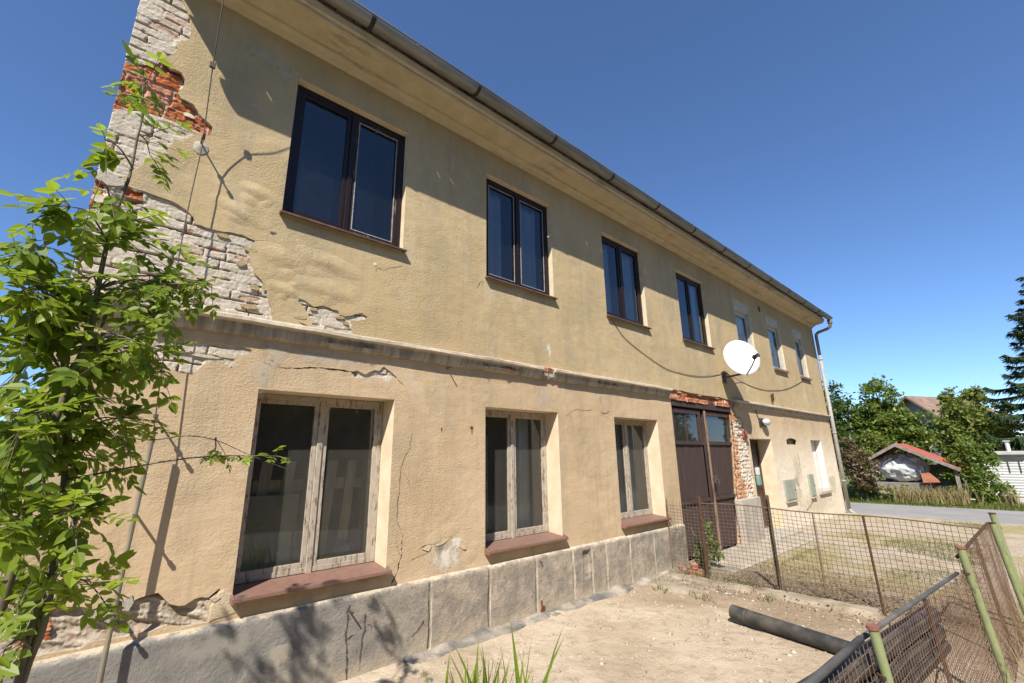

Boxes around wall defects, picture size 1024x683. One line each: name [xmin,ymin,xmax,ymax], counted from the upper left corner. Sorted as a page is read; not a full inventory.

flaking render [71,0,272,320]
flaking render [286,294,366,334]
spalling [669,390,755,499]
crack [397,436,435,561]
flaking render [0,627,26,657]
flaking render [36,589,219,655]
crack [344,605,372,680]